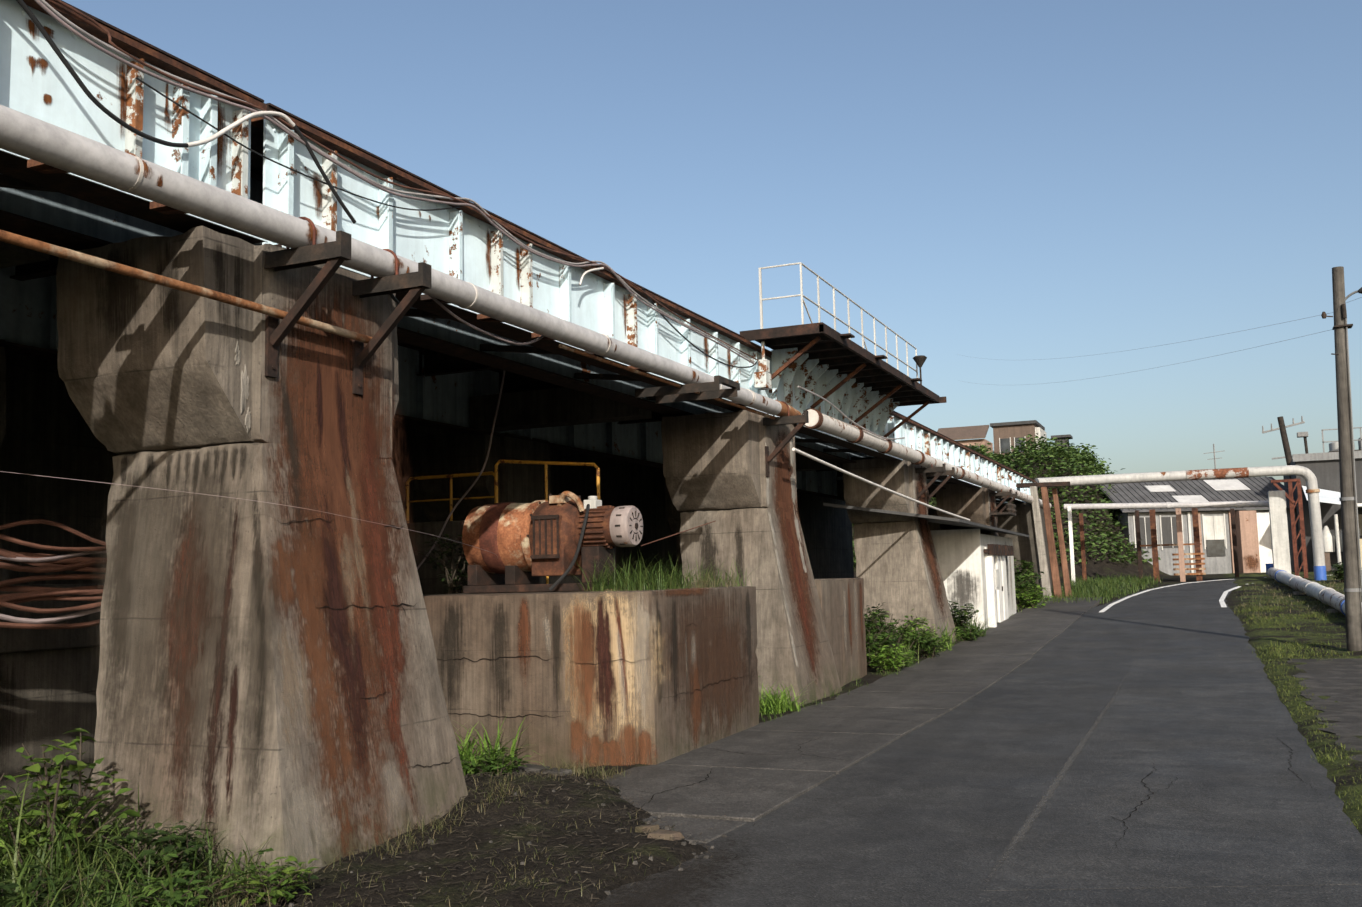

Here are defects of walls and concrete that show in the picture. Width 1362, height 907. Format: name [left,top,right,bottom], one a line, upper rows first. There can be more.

rust [119,65,127,133]
rust [135,159,163,187]
damp [147,447,246,488]
damp [253,497,265,754]
rust [268,291,414,849]
rust [518,599,531,675]
rust [566,600,656,767]
rust [772,433,818,675]